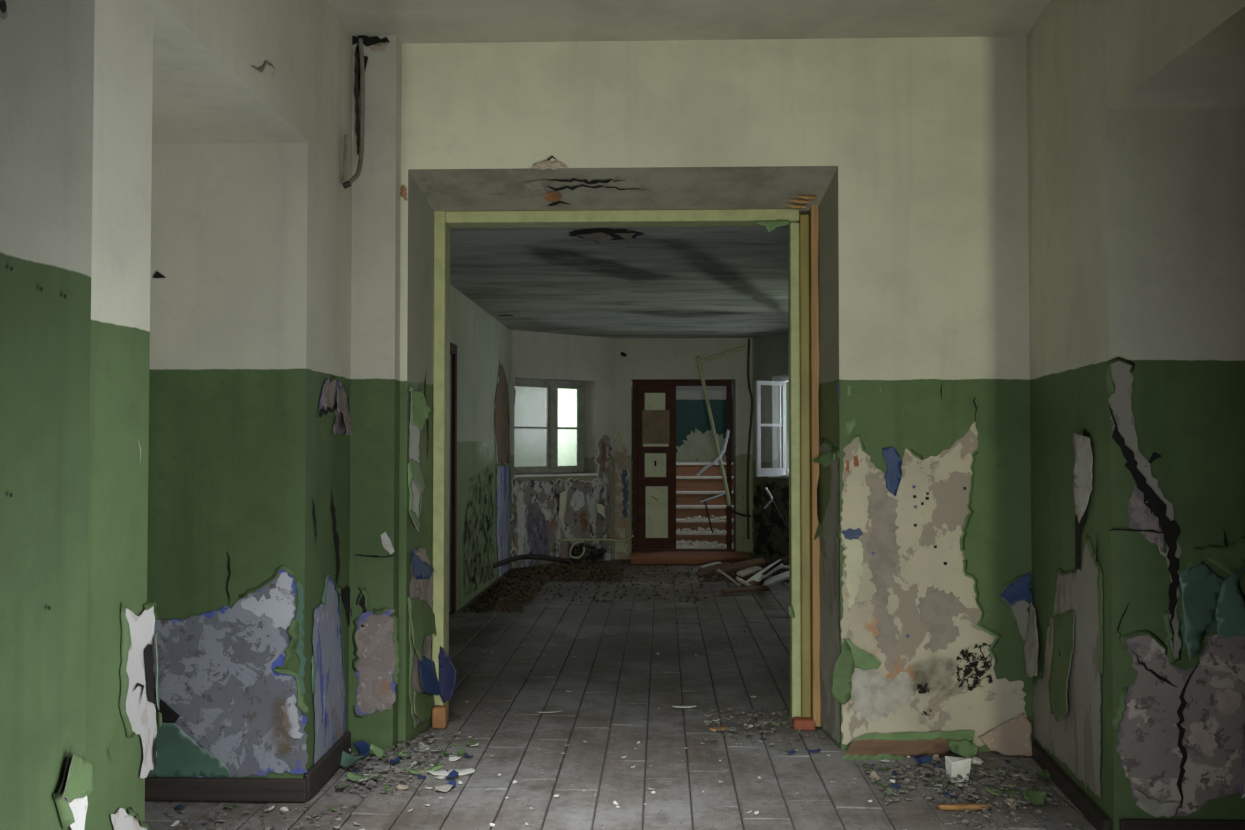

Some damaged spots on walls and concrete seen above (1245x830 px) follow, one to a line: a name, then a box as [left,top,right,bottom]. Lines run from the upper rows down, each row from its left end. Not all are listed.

crack [488,176,647,206]
peeling [318,376,354,437]
peeling [381,532,394,554]
peeling [407,377,431,531]
peeling [463,359,630,595]
crack [1096,357,1183,663]
peeling [811,422,1245,819]
peeling [119,548,456,779]
peeling [53,745,95,830]
peeling [111,807,150,830]
peeling [335,741,479,792]